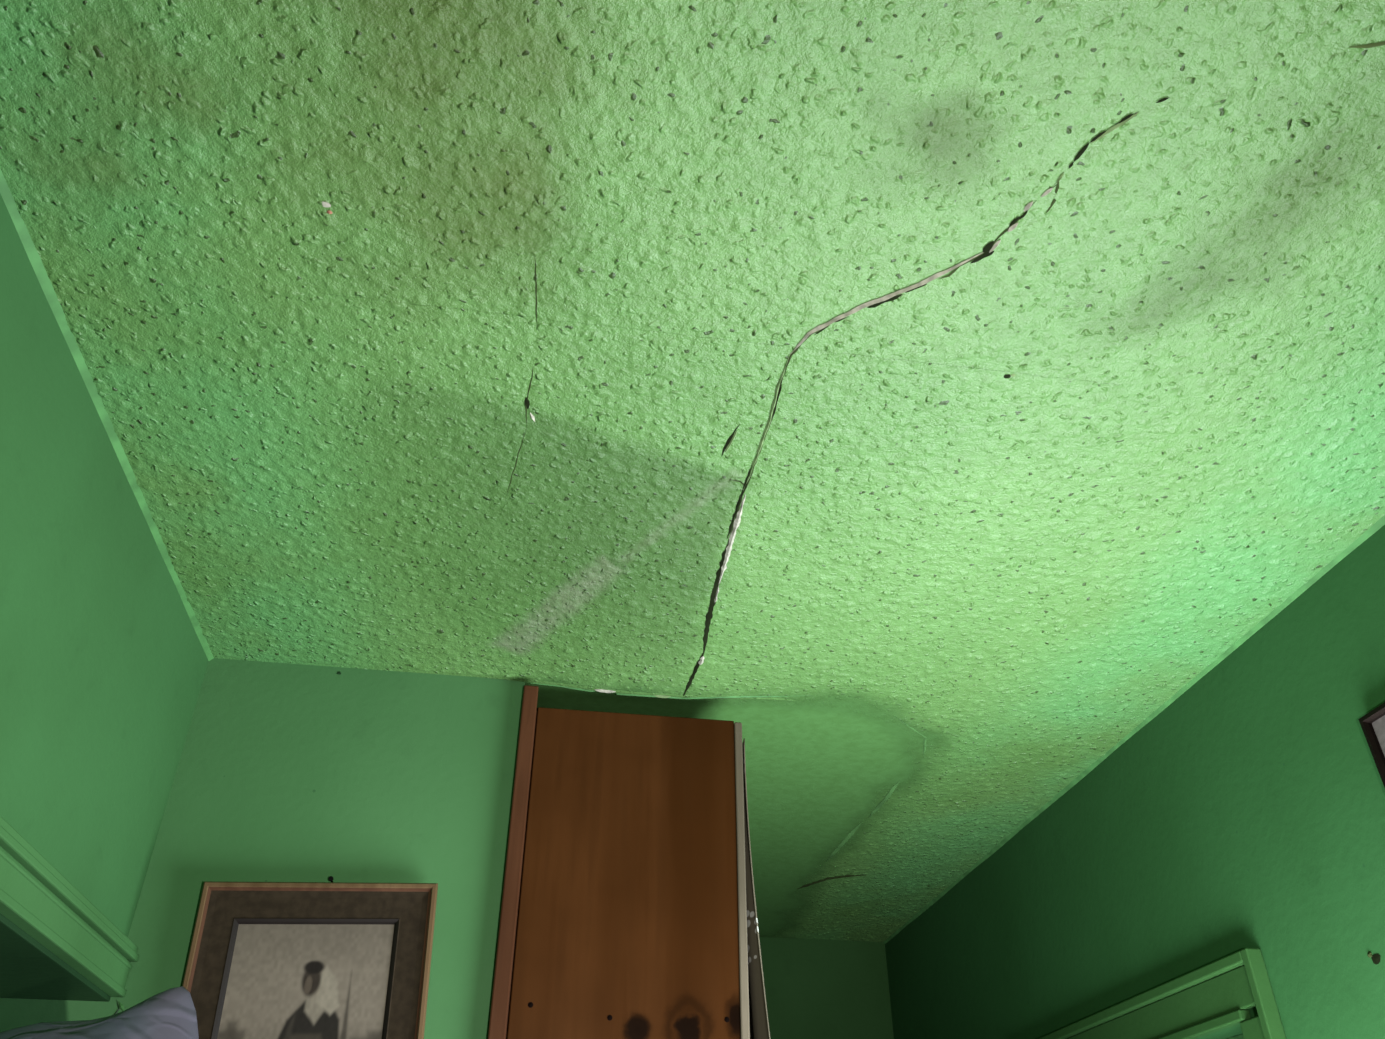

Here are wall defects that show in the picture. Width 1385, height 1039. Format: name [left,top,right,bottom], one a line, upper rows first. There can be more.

crack [519,97,1170,699]